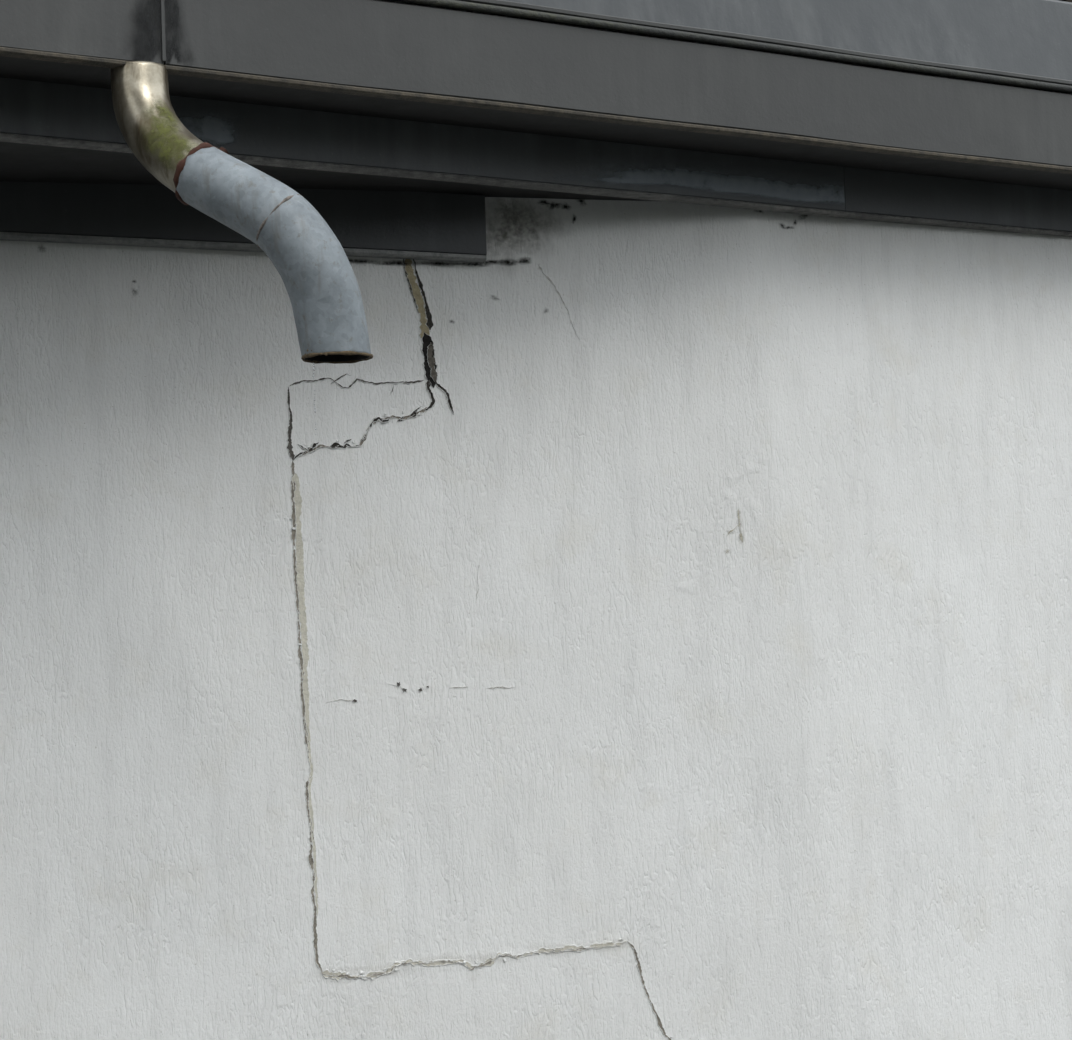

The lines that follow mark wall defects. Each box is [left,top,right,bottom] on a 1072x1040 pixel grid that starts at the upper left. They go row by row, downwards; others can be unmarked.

crack [286,259,672,1040]